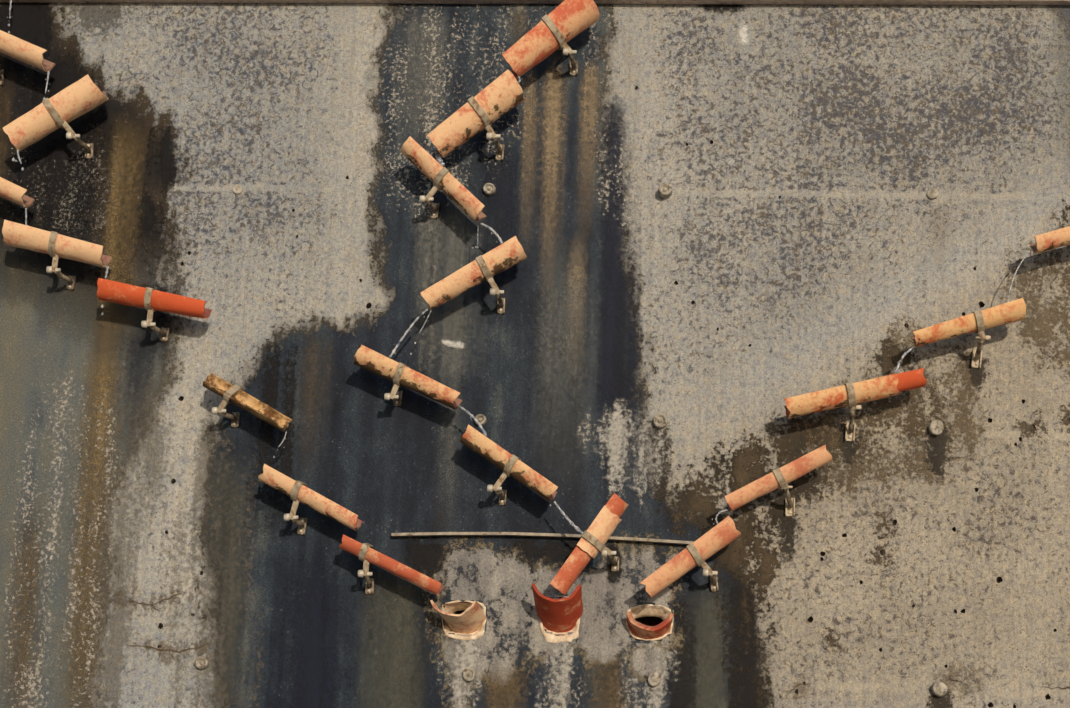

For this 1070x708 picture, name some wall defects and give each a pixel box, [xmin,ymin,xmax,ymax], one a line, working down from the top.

water stain [1049,5,1070,40]
water stain [1051,199,1070,230]
water stain [0,2,195,708]
water stain [192,3,1001,708]
water stain [999,242,1070,384]